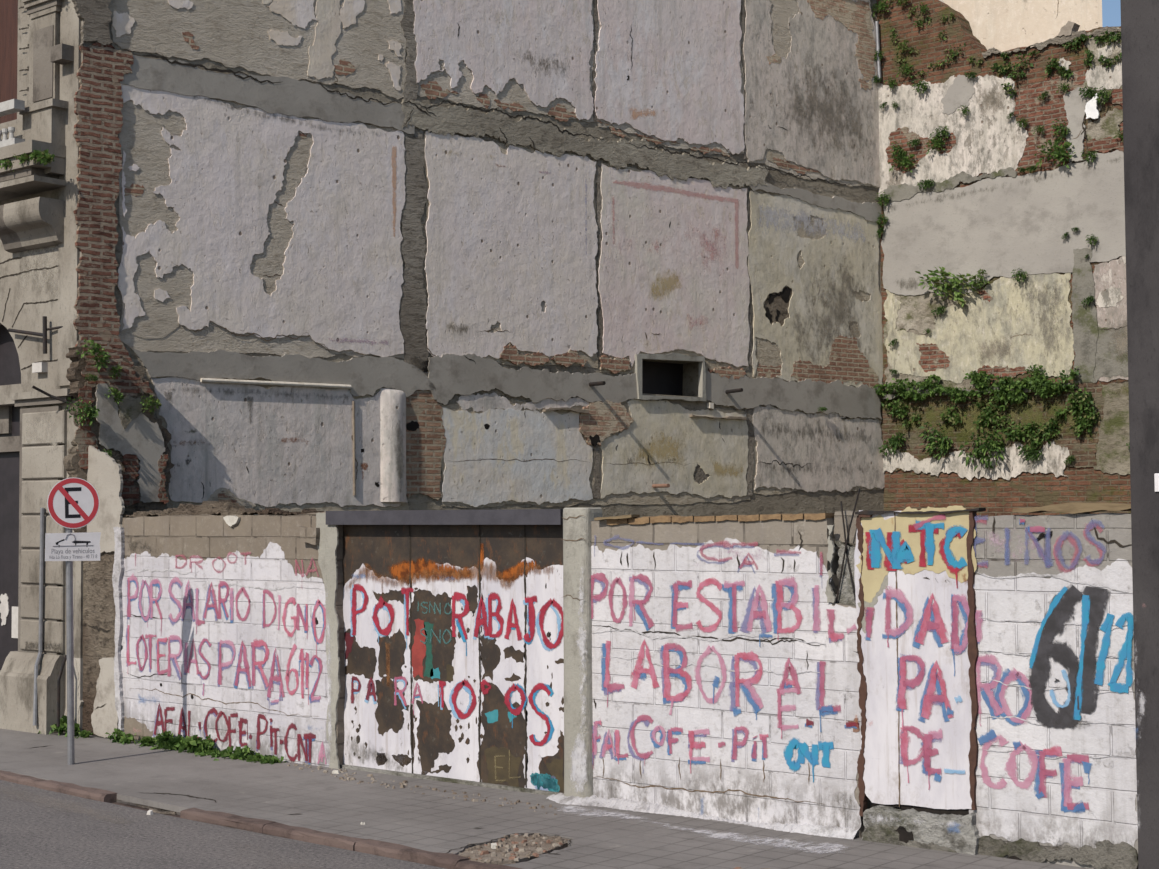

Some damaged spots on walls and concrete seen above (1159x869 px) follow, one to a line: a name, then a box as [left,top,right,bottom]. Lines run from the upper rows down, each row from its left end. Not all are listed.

flaking render [766,0,876,90]
flaking render [118,100,186,237]
flaking render [885,127,956,174]
flaking render [250,131,313,296]
flaking render [128,251,194,339]
spalling [764,286,793,326]
flaking render [707,321,879,388]
rust [349,545,550,587]
peeling [344,585,528,788]
peeling [546,658,564,712]
peeling [539,730,564,793]
spalling [861,824,957,853]